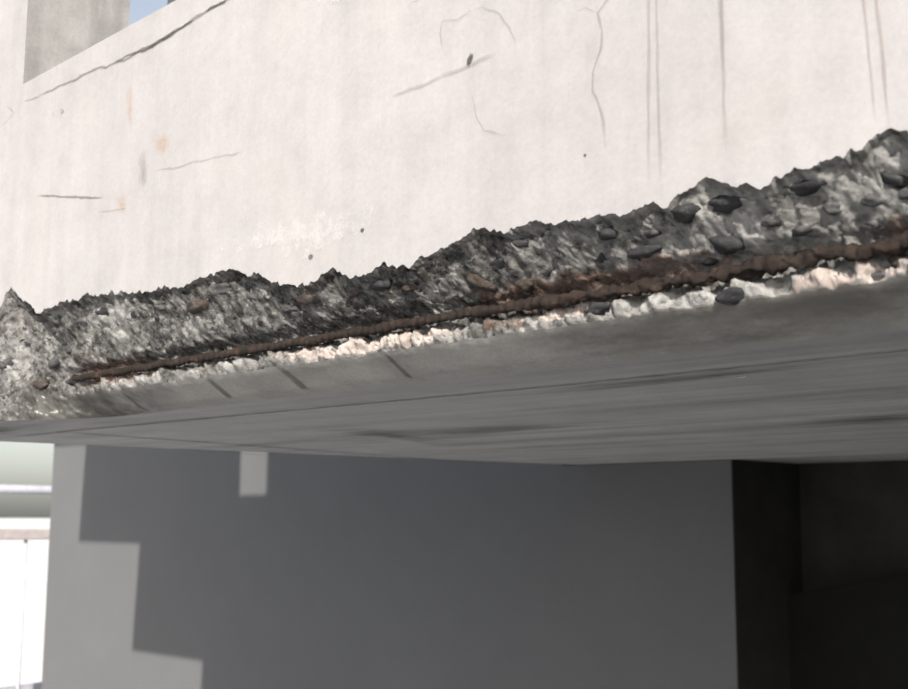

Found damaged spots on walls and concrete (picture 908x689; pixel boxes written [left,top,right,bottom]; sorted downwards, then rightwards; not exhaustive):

spalling [0,128,908,421]
corrosion [483,309,538,331]
corrosion [81,355,152,388]